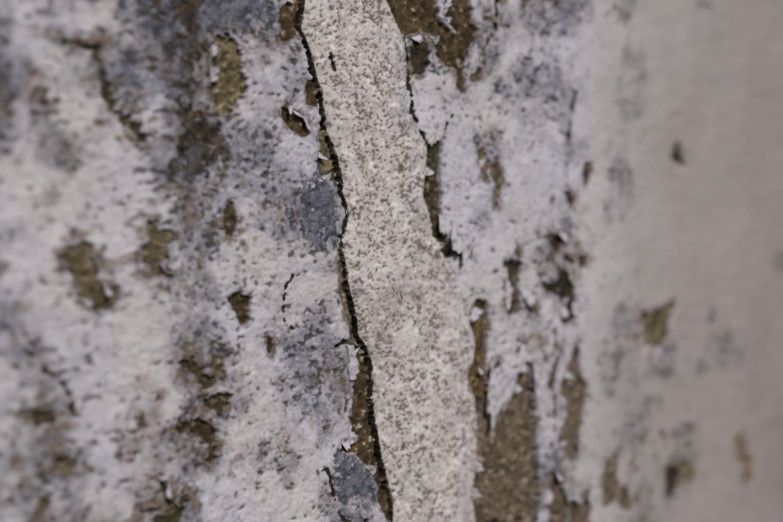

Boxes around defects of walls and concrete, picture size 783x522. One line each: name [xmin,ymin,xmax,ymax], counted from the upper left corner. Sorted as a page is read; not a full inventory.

spalling [167,34,246,187]
crack [393,18,454,144]
peeling [386,0,480,93]
peeling [423,119,472,265]
peeling [477,153,502,205]
peeling [57,241,120,311]
crack [294,0,393,522]
peeling [337,249,391,521]
peeling [467,300,592,522]
peeling [504,232,585,323]
spalling [641,300,672,348]
peeling [603,455,631,509]